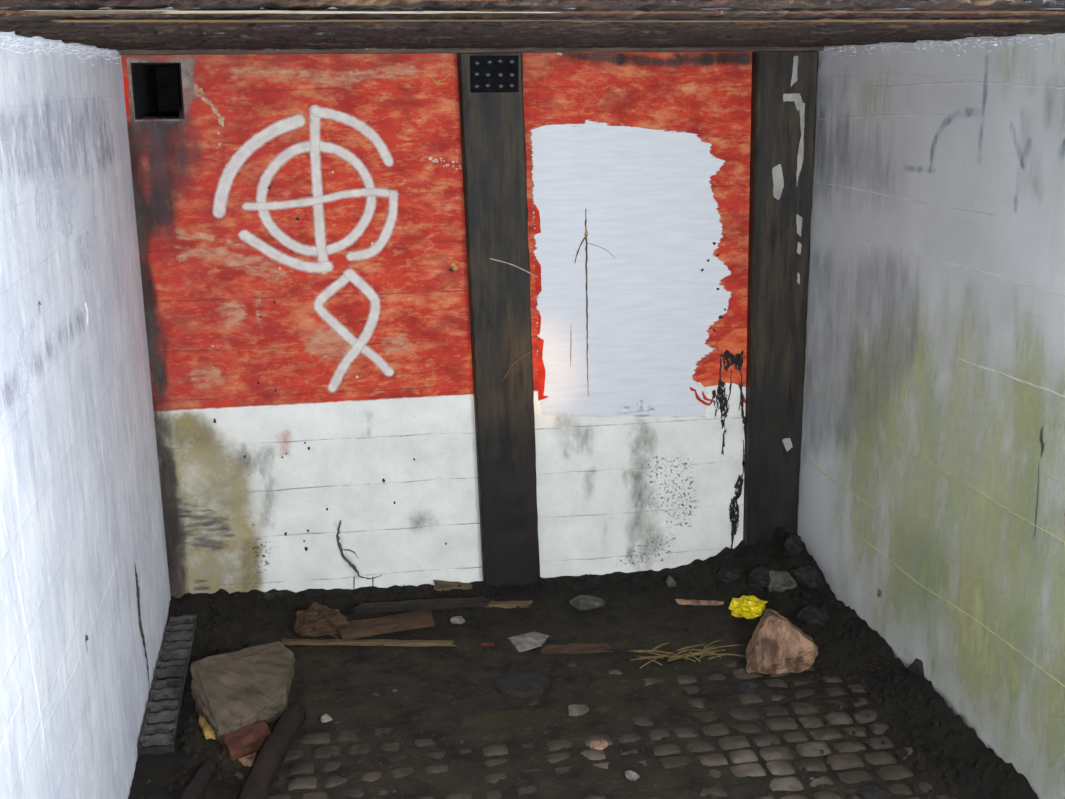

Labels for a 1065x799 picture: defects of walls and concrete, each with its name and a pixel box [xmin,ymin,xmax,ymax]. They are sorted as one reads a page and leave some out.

peeling [533,204,541,234]
leakage [140,265,164,381]
peeling [538,310,549,401]
leakage [157,414,270,598]
leakage [636,456,695,527]
crack [336,520,382,589]